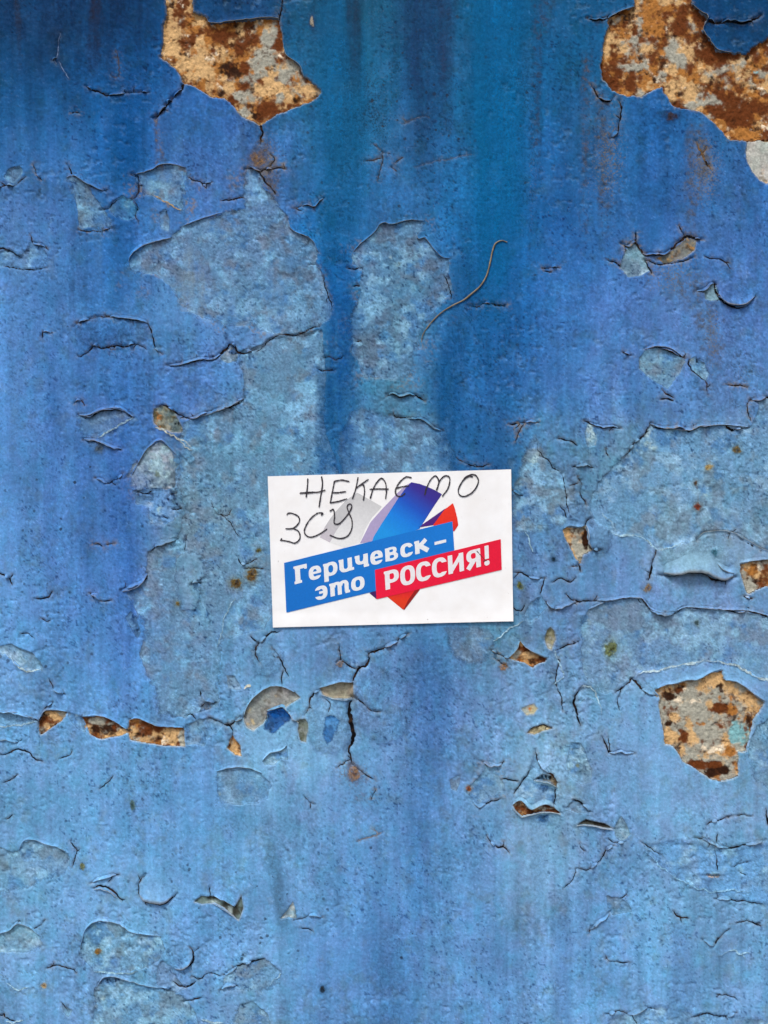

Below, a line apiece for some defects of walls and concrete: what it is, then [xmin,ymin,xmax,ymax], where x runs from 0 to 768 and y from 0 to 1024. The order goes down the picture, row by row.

rust [161,0,321,125]
rust [583,0,768,142]
peeling [639,343,709,389]
peeling [66,161,452,746]
crack [510,347,768,618]
rust [739,557,768,593]
rust [38,707,68,734]
rust [82,713,185,746]
crack [250,631,289,683]
crack [288,634,407,800]
crack [474,641,590,811]
rust [655,667,766,781]